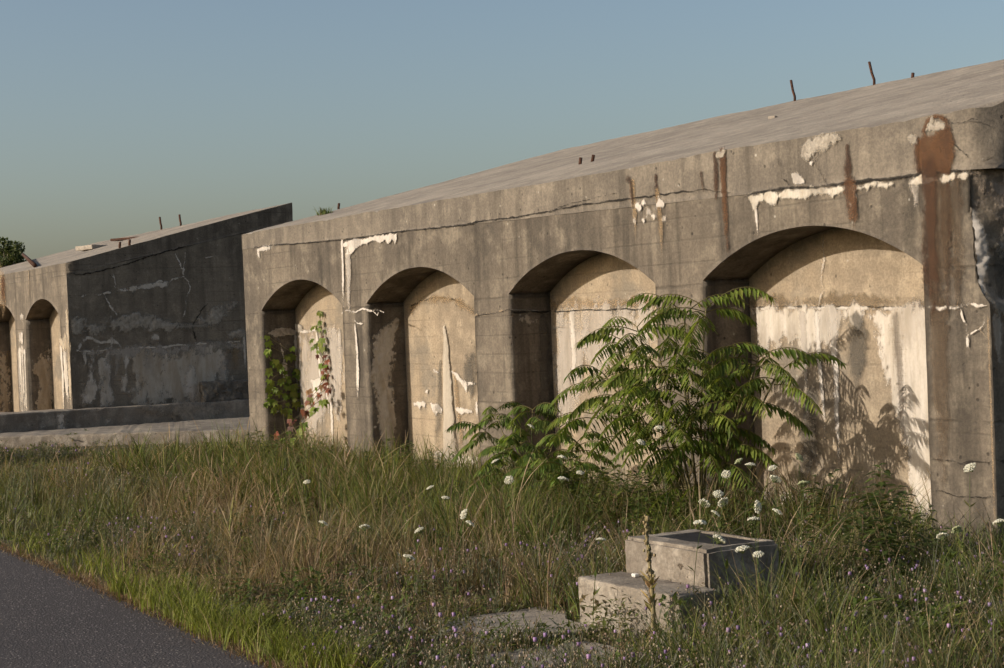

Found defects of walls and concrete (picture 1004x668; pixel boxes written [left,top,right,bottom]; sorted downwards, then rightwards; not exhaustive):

crack [73,245,213,344]
crack [254,153,966,262]
rust [700,148,728,250]
spalling [801,133,841,165]
rust [843,144,857,226]
rust [915,127,960,373]
peeling [970,158,1004,294]
peeling [0,332,53,412]
peeling [70,301,239,421]
peeling [370,318,400,457]
leakage [752,301,932,528]